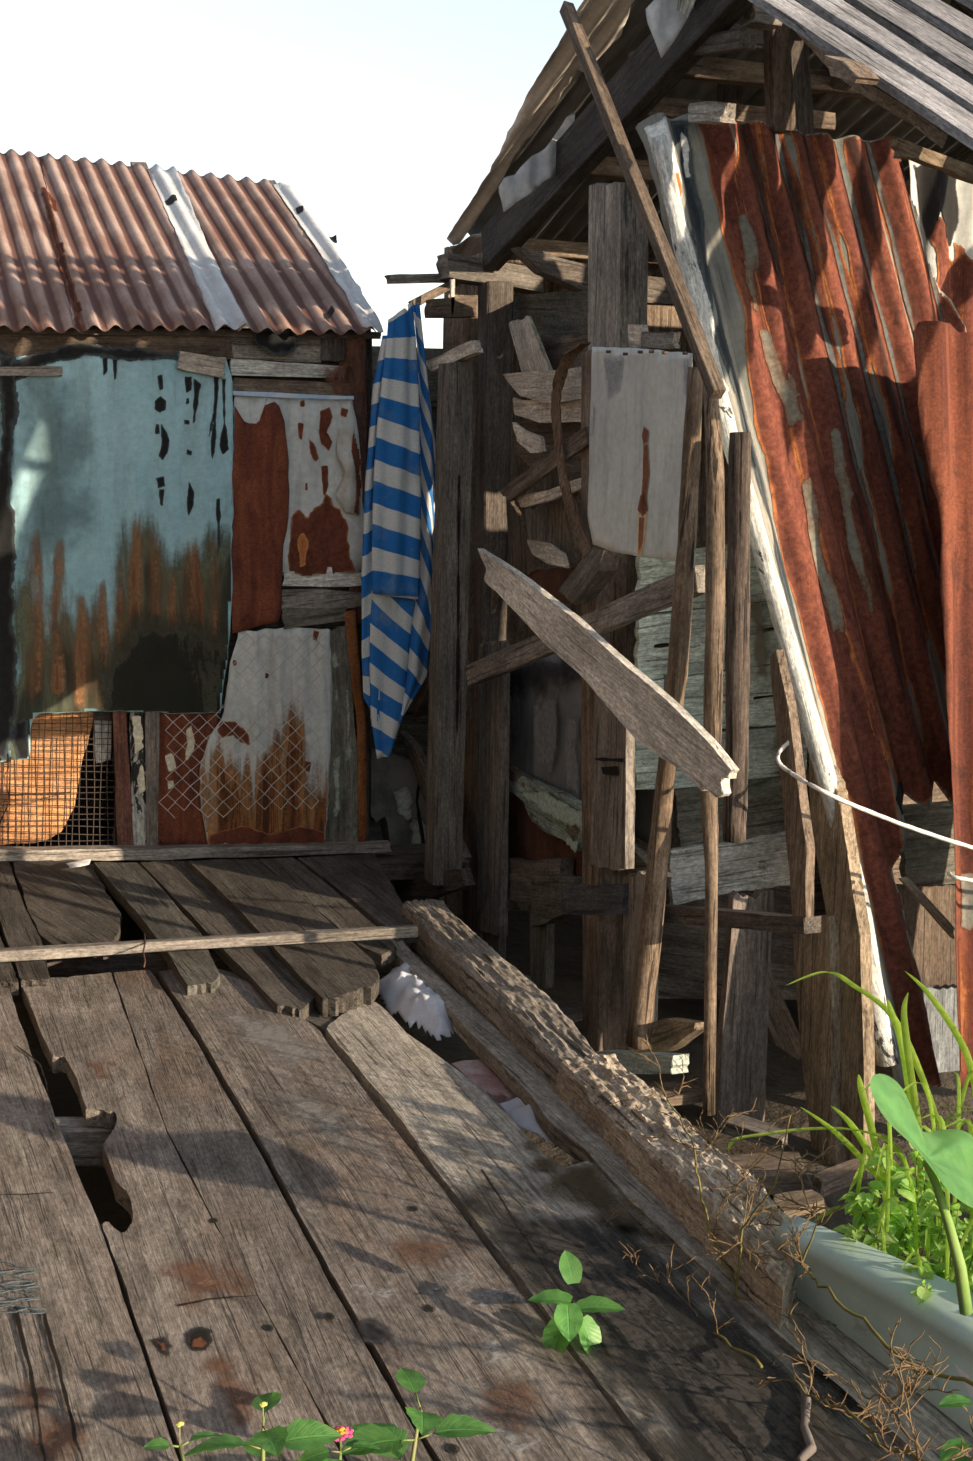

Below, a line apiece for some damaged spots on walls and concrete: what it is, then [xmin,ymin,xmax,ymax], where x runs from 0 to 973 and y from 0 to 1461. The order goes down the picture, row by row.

leakage [0,522,231,761]
corrosion [28,399,355,709]
corrosion [637,427,649,556]
corrosion [699,120,973,1087]
corrosion [158,706,328,845]